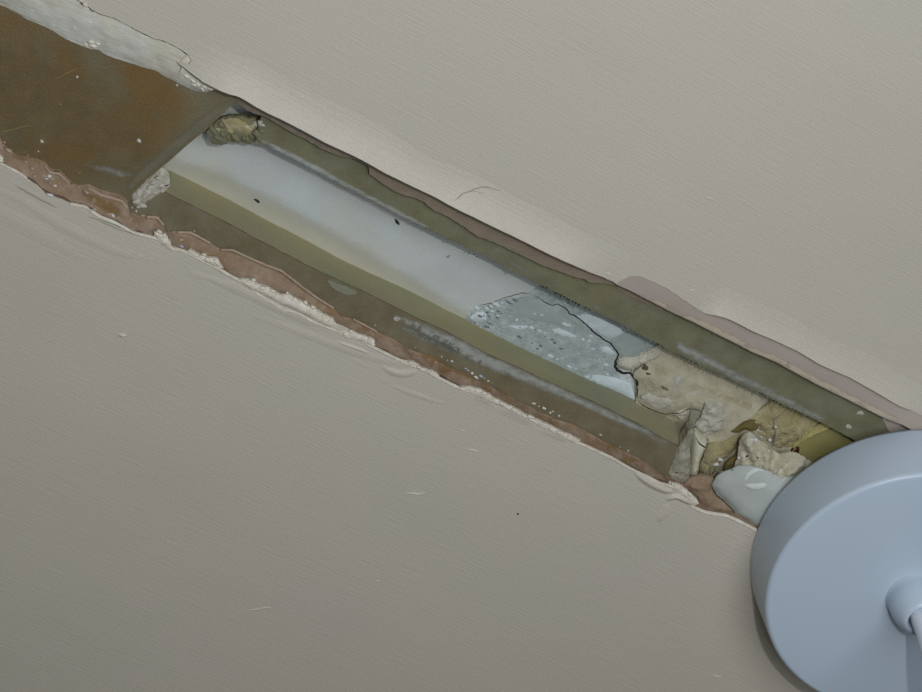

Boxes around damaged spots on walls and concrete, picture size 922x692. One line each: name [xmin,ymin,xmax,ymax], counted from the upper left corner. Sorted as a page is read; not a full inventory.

flaking render [0,138,757,532]
peeling [617,276,922,430]